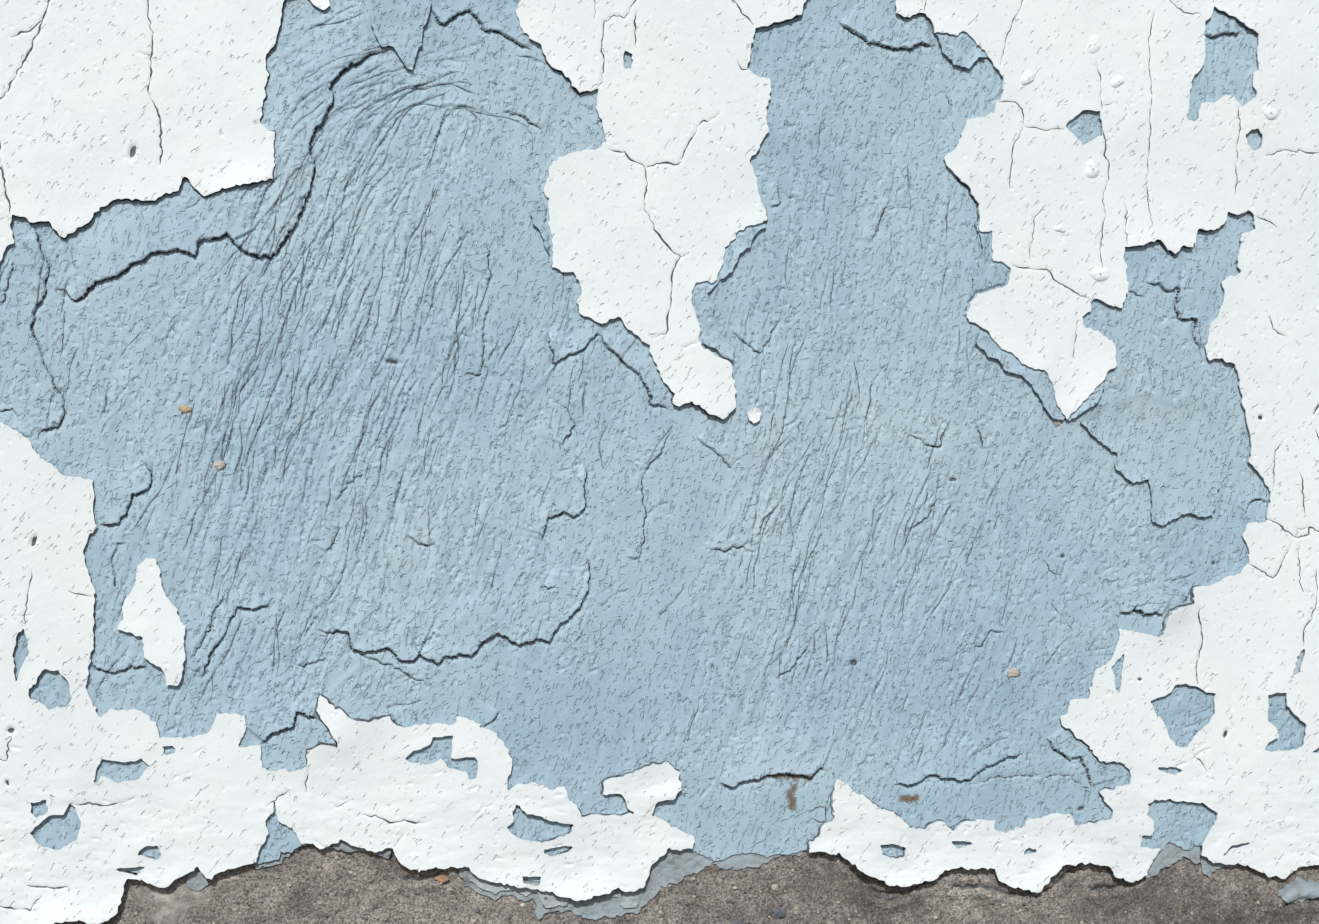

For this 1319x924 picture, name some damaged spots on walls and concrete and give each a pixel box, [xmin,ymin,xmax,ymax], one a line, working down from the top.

crack [0,0,50,99]
crack [143,0,163,163]
peeling [1187,7,1258,121]
crack [0,143,11,213]
crack [1097,0,1214,265]
crack [1013,205,1089,357]
crack [1249,444,1319,646]
peeling [12,629,72,710]
peeling [1151,684,1215,747]
peeling [507,805,573,856]
peeling [458,848,782,920]
peeling [1141,799,1249,878]